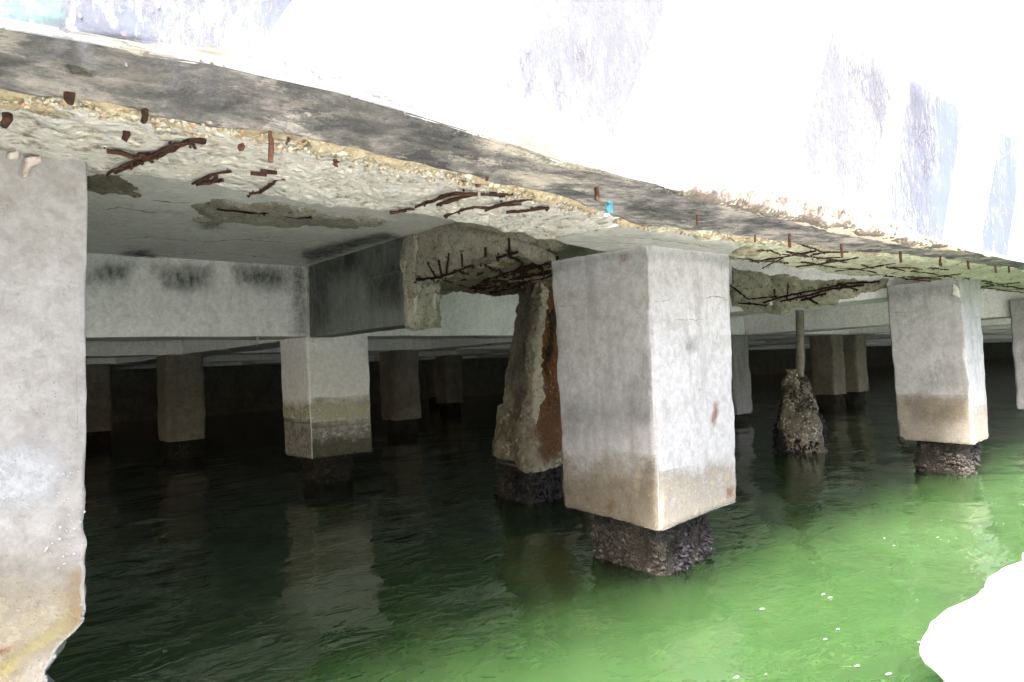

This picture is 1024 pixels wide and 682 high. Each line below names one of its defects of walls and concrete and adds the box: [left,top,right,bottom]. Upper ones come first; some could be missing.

spalling [0,89,1024,425]
water stain [284,419,371,459]
rust [535,284,562,461]